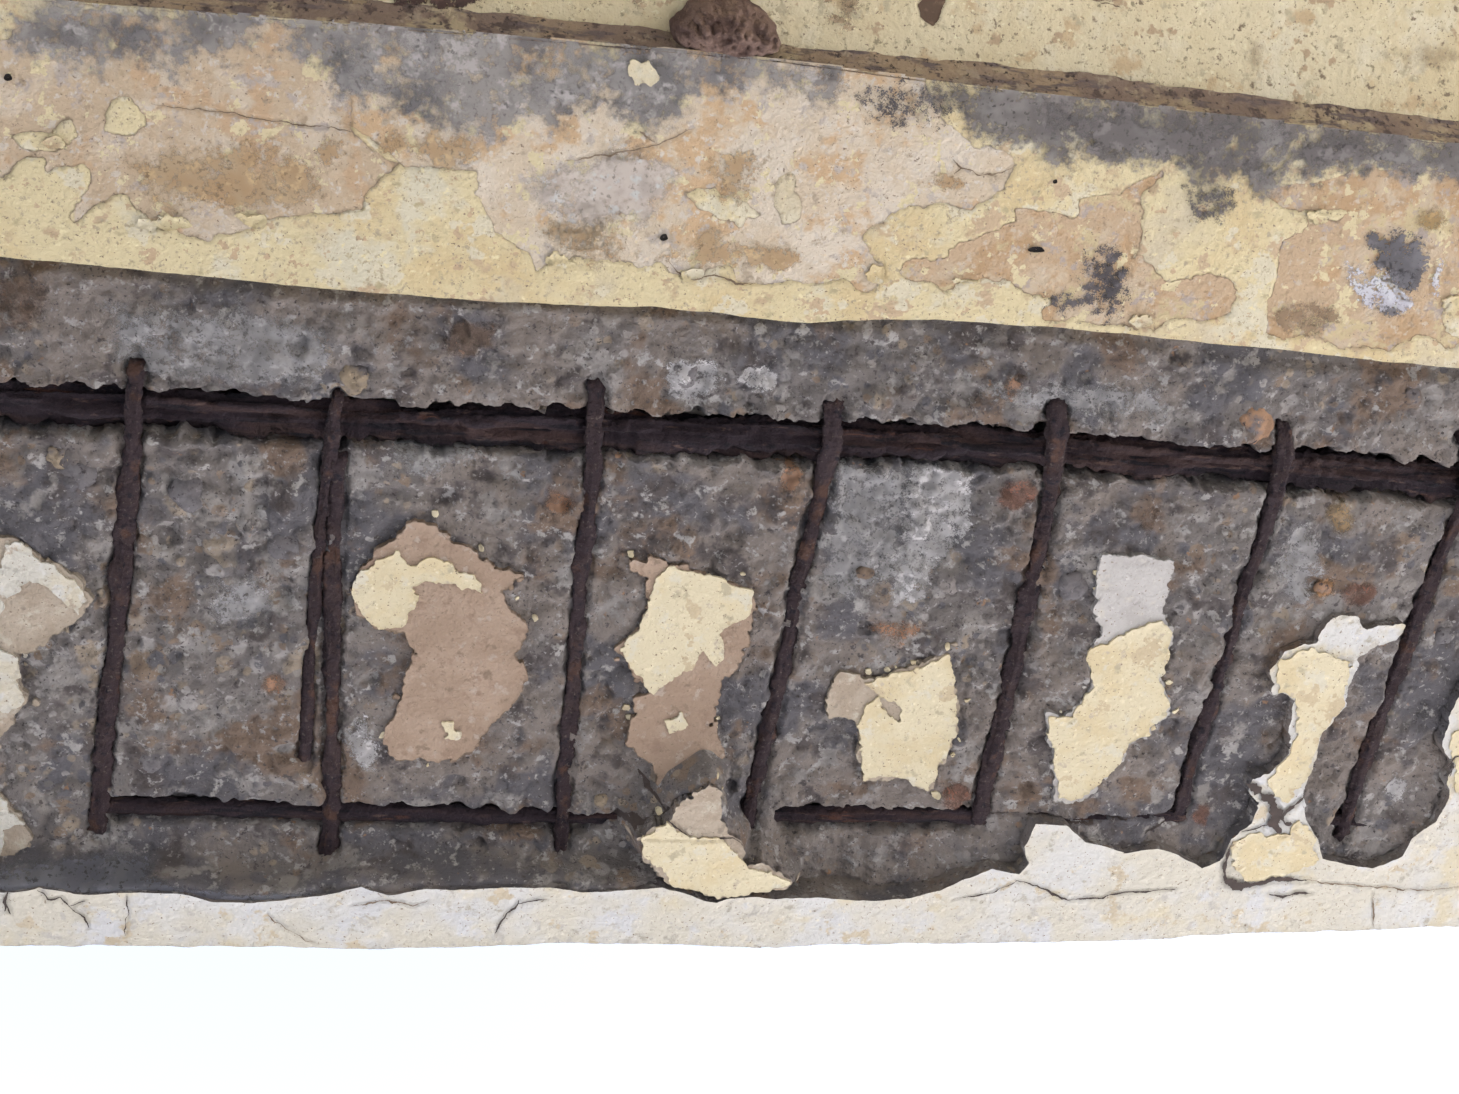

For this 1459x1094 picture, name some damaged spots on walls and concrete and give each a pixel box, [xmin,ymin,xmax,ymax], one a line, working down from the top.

peeling [814,0,859,32]
peeling [918,0,946,26]
damp [5,0,1459,226]
peeling [0,10,1015,293]
corrosion [997,480,1038,511]
spalling [0,163,1459,899]
corrosion [1314,578,1378,607]
corrosion [942,783,973,810]